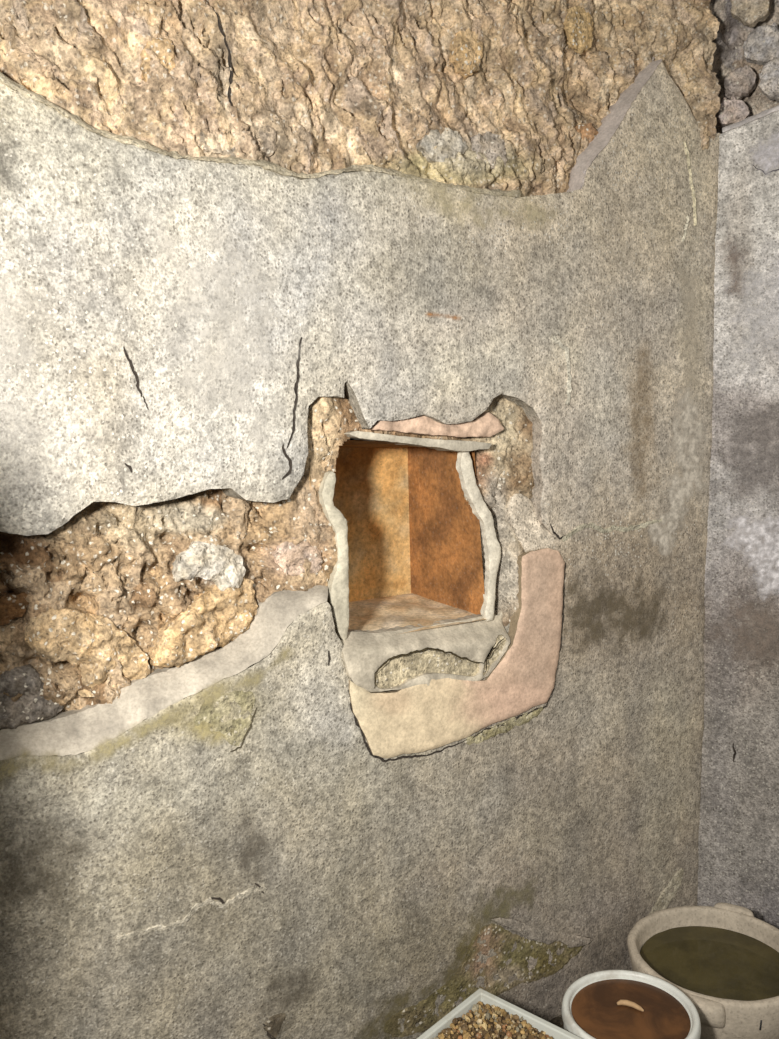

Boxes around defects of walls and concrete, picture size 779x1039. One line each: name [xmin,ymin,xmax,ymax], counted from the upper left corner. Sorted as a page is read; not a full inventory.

crack [215,12,233,115]
flaking render [0,0,779,198]
flaking render [681,141,697,242]
crack [123,346,149,410]
crack [282,337,302,480]
flaking render [0,392,662,760]
water stain [727,517,779,599]